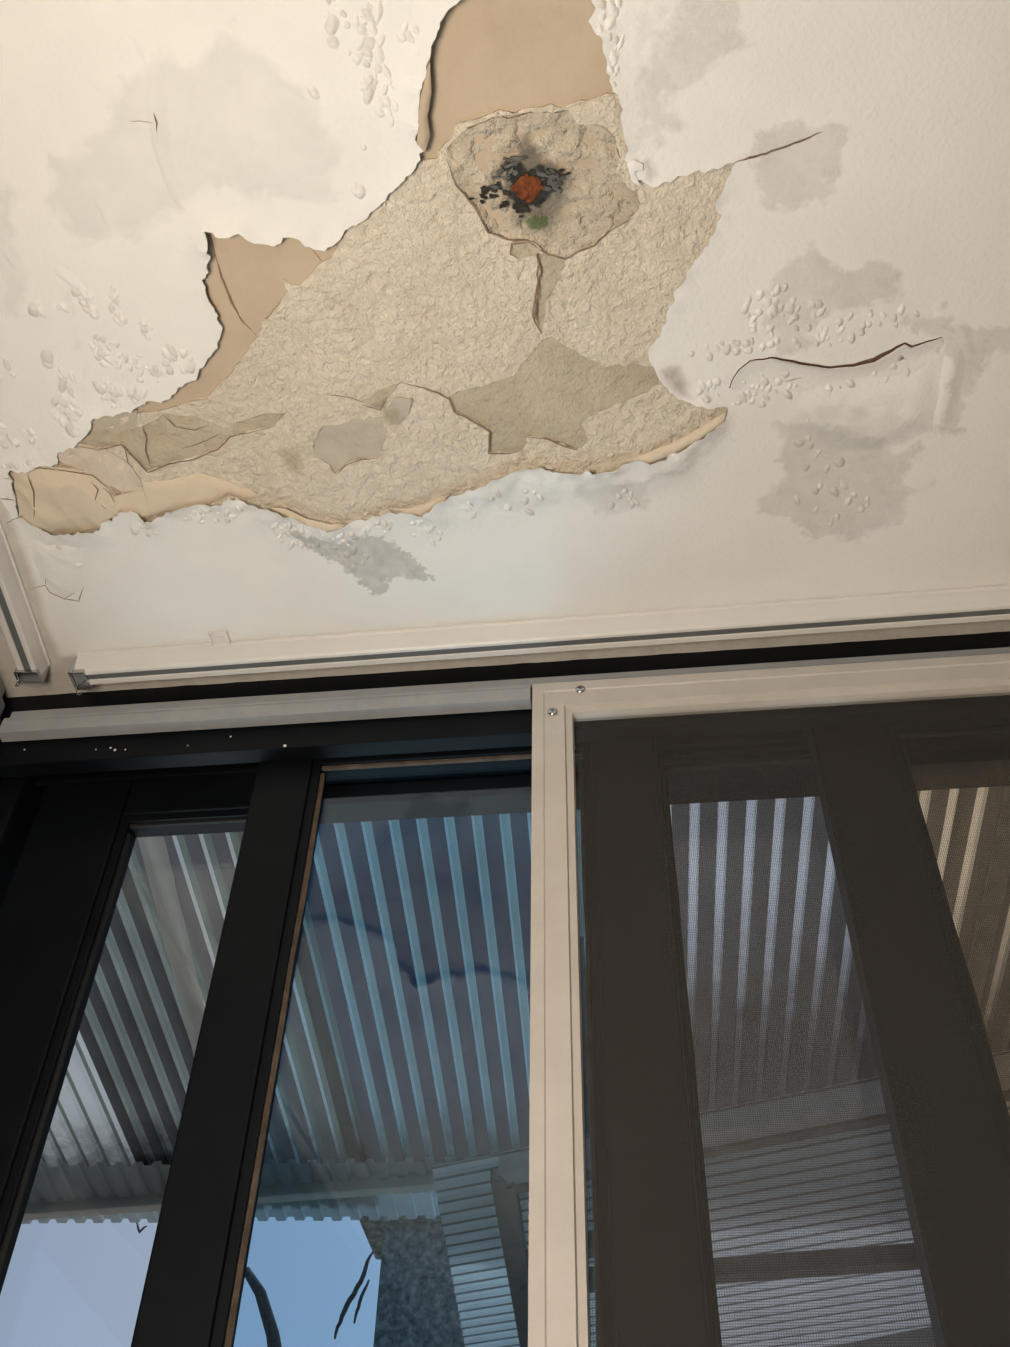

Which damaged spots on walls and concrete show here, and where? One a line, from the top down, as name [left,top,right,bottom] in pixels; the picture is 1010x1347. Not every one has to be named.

corrosion [511,173,544,203]
peeling [0,0,769,564]
crack [727,335,944,390]